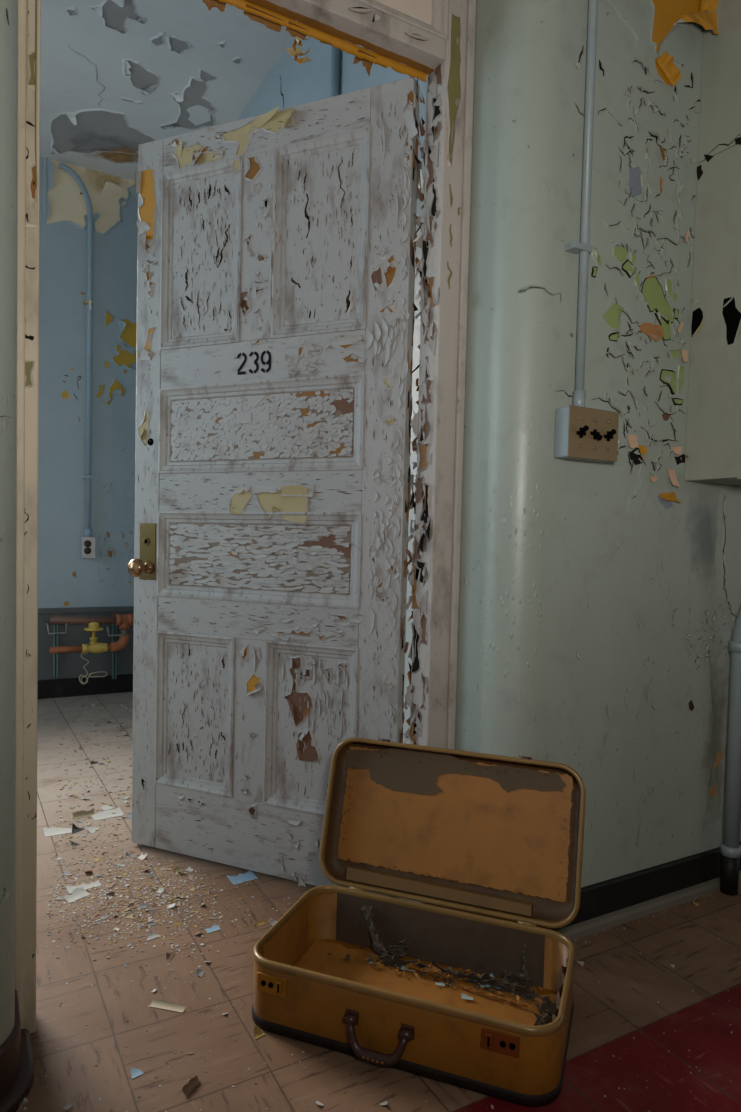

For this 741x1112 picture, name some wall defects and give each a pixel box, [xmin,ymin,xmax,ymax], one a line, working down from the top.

peeling [649,0,719,86]
peeling [25,360,35,388]
peeling [95,309,156,406]
peeling [202,0,461,745]
peeling [591,245,706,421]
peeling [138,407,151,447]
peeling [171,389,354,461]
peeling [628,435,648,465]
peeling [650,446,688,509]
peeling [169,485,351,594]
peeling [281,655,348,762]